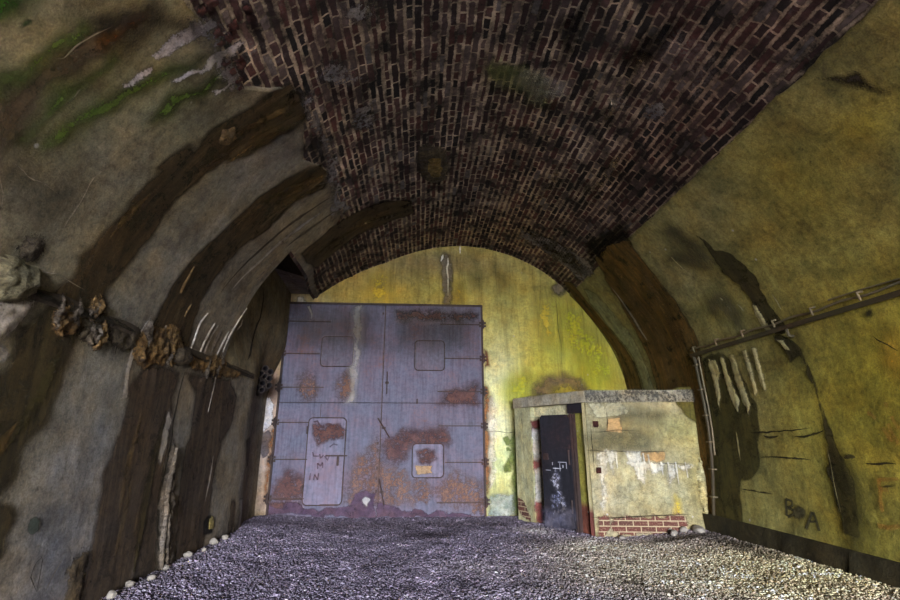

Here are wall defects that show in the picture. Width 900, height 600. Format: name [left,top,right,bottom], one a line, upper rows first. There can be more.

water stain [0,0,180,147]
water stain [0,81,307,493]
corrosion [396,310,478,322]
water stain [440,246,461,304]
water stain [81,164,415,600]
corrosion [264,428,304,502]
corrosion [312,424,345,445]
corrosion [347,383,491,507]
flaking render [597,513,688,538]
water stain [552,240,766,522]
water stain [663,226,864,553]